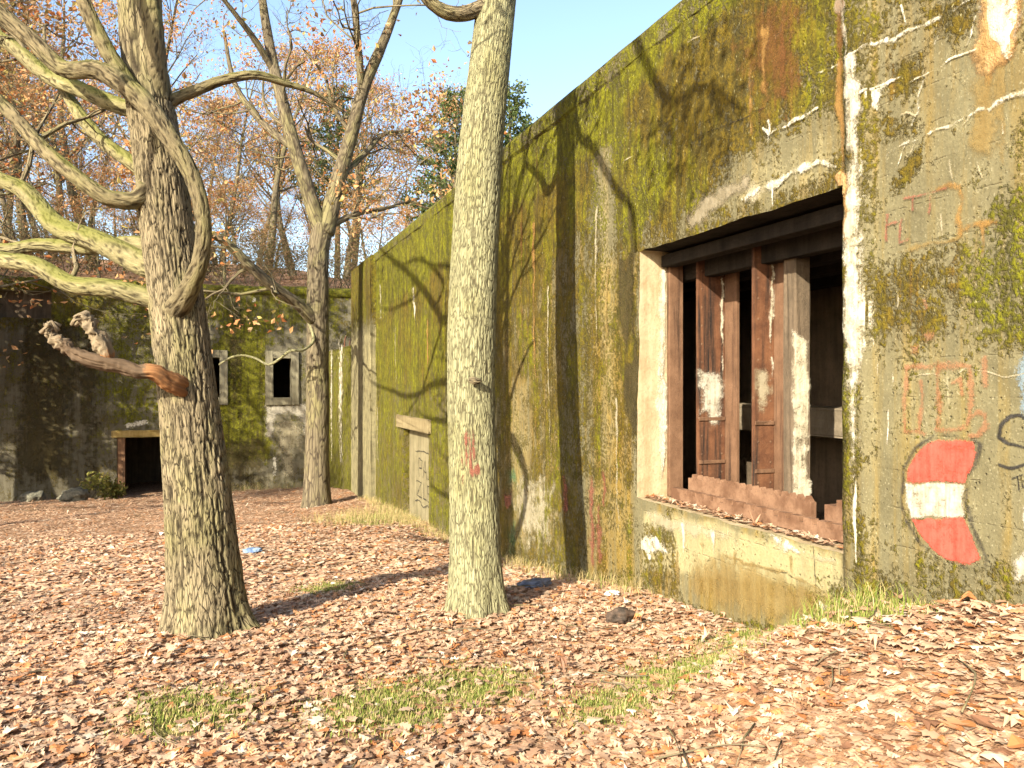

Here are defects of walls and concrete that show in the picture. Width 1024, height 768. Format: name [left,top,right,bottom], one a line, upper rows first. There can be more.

rust [835,59,844,157]
water stain [835,0,871,440]
peeling [641,513,724,559]